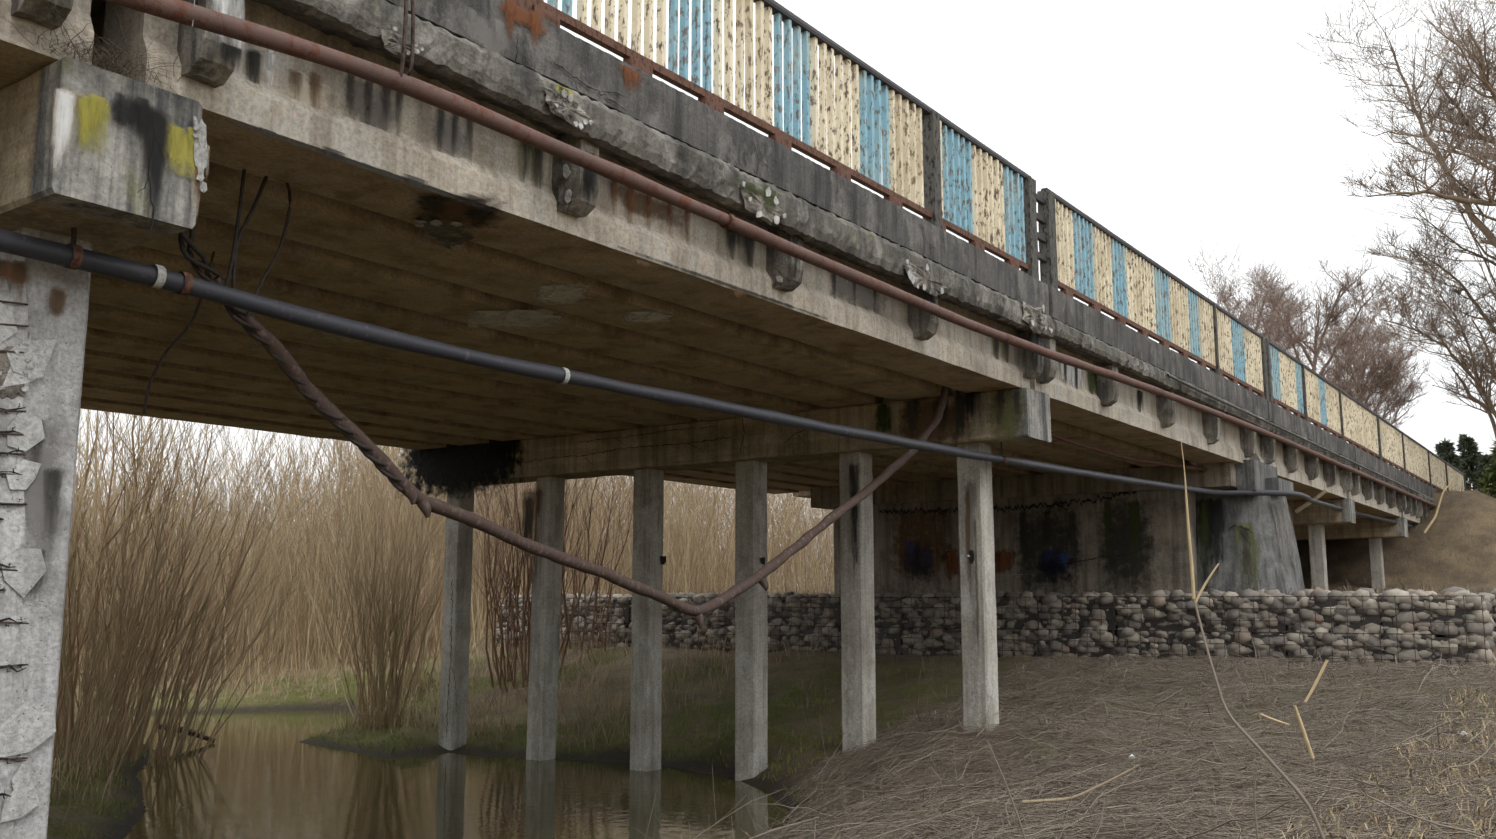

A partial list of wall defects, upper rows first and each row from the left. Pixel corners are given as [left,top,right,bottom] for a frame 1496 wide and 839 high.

leakage [216,0,242,19]
corrosion [502,0,547,40]
leakage [221,39,329,110]
leakage [347,74,403,131]
leakage [435,109,473,155]
spalling [414,215,474,249]
crack [0,403,27,519]
spalling [0,276,56,839]
leakage [1098,499,1154,592]
crack [0,563,26,628]
crack [0,664,27,673]
crack [0,754,26,799]